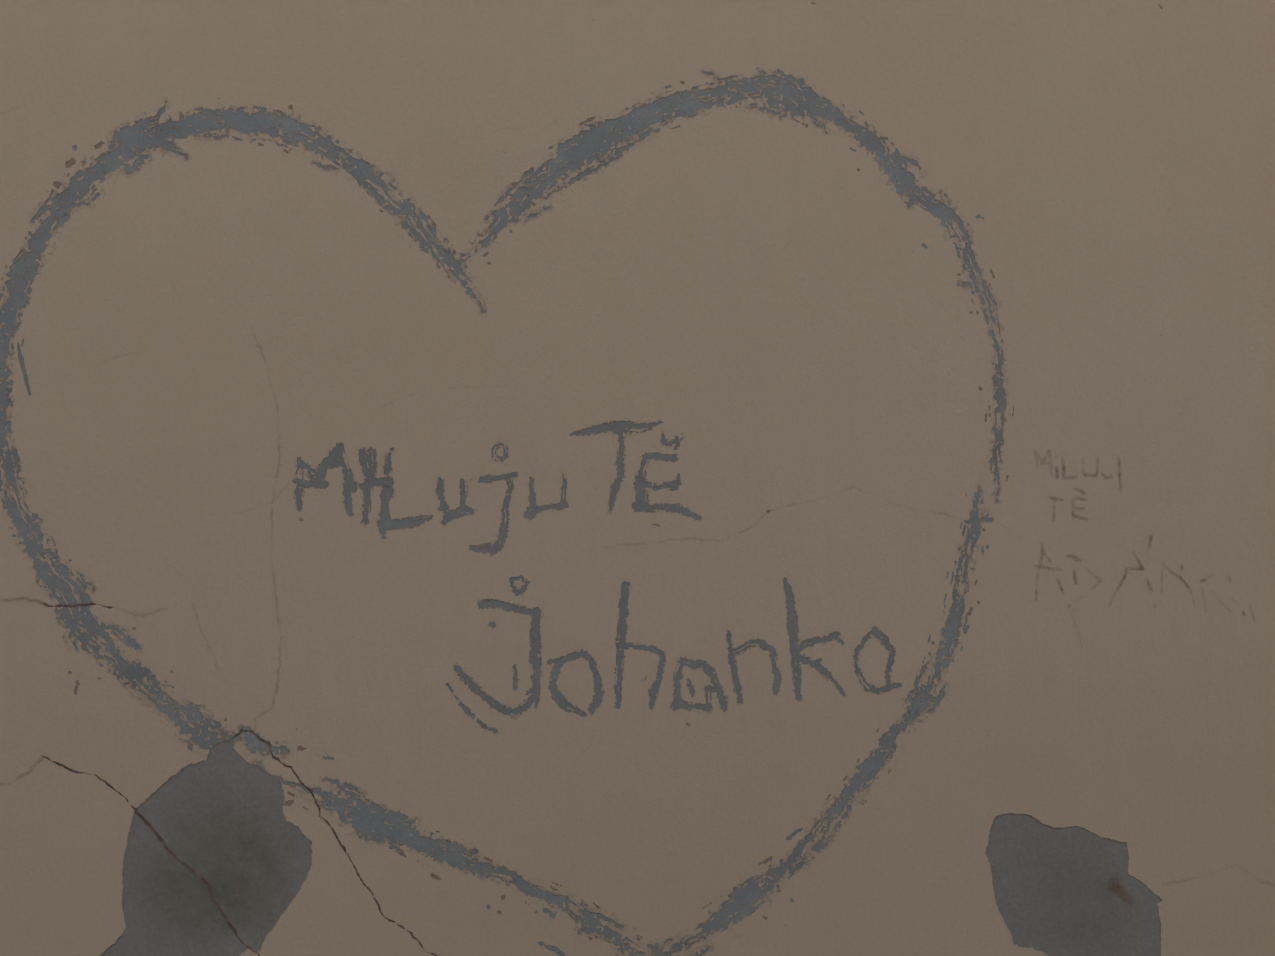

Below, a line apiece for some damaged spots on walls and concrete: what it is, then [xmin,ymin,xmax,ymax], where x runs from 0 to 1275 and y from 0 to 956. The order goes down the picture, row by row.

crack [43,601,113,609]
crack [42,756,260,956]
peeling [100,739,313,956]
crack [231,729,437,956]
peeling [985,813,1162,956]